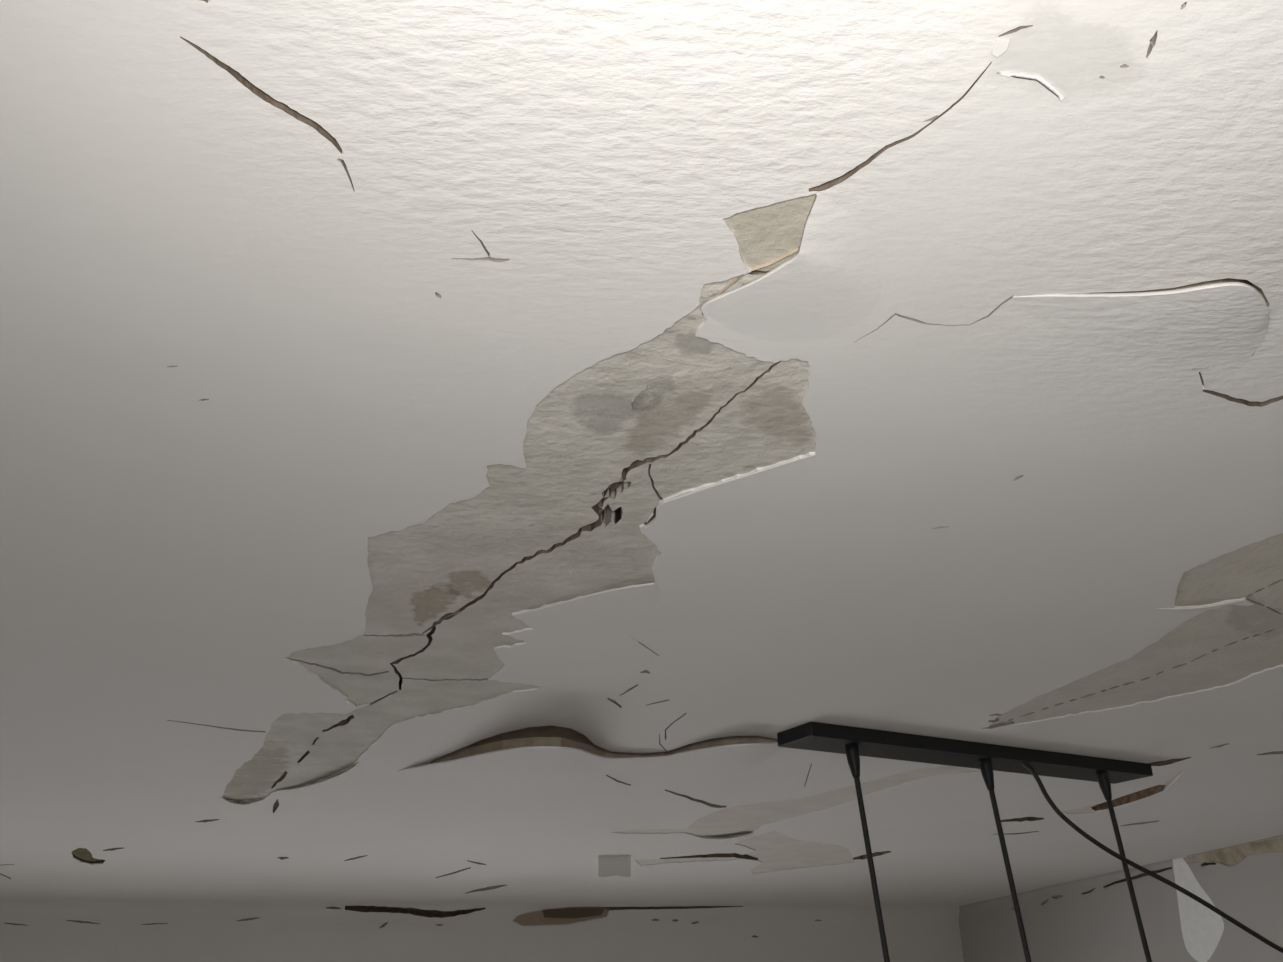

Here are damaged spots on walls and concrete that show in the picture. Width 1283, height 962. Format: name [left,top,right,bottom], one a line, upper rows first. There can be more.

crack [180,36,355,191]
crack [809,25,1033,192]
crack [451,231,510,262]
crack [1192,368,1283,407]
peeling [195,194,816,823]
crack [272,361,781,788]
peeling [991,533,1283,725]
crack [326,860,507,918]
peeling [598,856,631,877]
peeling [618,766,975,843]